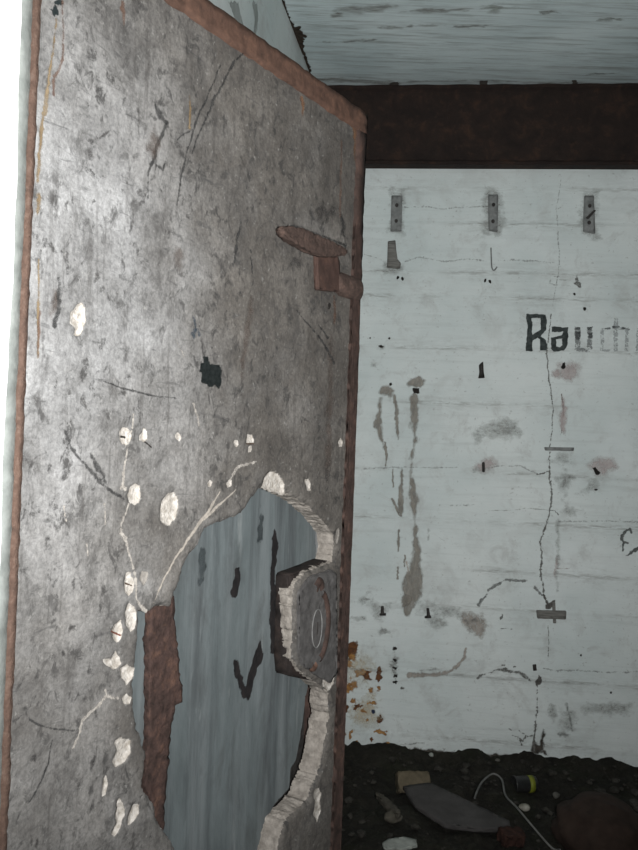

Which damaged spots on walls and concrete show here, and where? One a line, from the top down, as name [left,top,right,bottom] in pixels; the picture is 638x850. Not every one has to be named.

crack [119,414,147,613]
spalling [160,492,178,526]
crack [229,461,257,480]
leakage [373,376,424,615]
crack [536,314,572,609]
crack [72,689,119,749]
corrosion [141,596,183,830]
spalling [257,471,339,850]
corrosion [346,642,390,743]
crack [532,631,560,752]